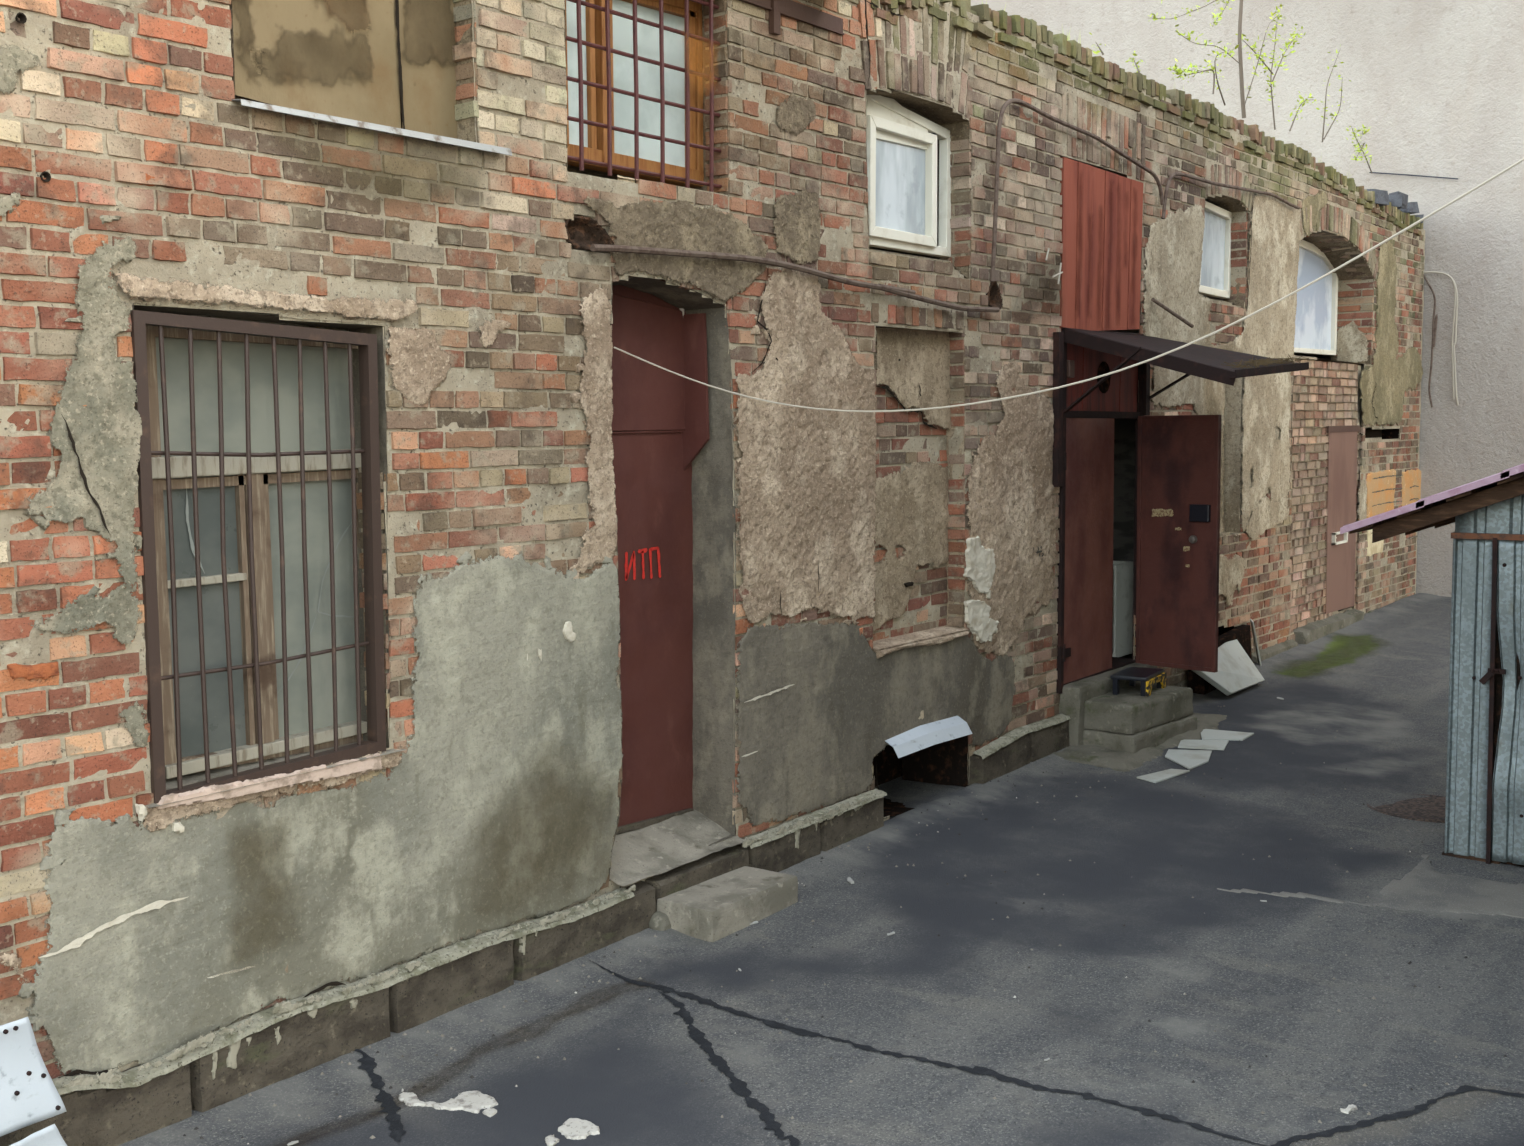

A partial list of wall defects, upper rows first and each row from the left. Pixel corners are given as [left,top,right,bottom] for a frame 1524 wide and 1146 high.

flaking render [23,215,143,648]
crack [61,414,110,534]
flaking render [565,196,1057,656]
crack [58,1067,117,1078]
crack [303,981,347,998]
spalling [61,884,636,1087]
crack [355,1049,406,1143]
crack [590,960,1524,1146]